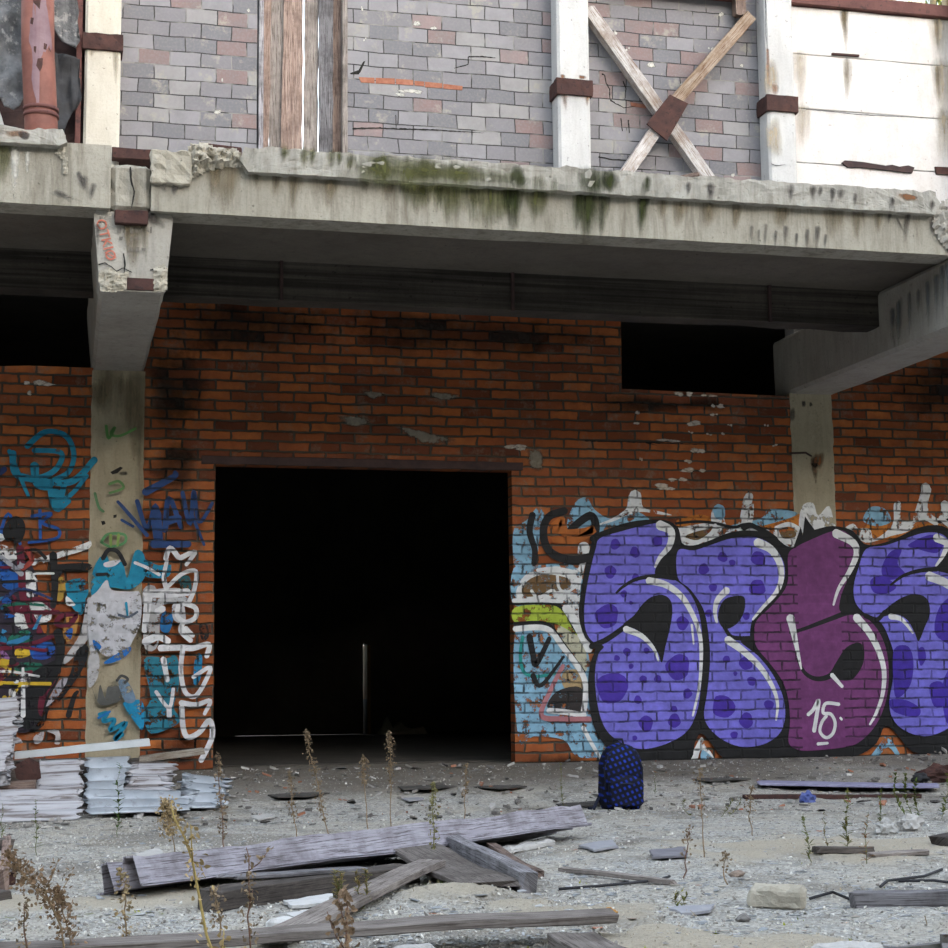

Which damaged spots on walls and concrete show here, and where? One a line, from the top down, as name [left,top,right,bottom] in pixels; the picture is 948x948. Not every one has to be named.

spalling [149,142,243,188]
crack [128,167,136,208]
damp [402,167,546,221]
damp [574,170,616,231]
damp [639,177,650,226]
damp [706,184,714,219]
damp [751,207,827,244]
damp [811,187,842,225]
damp [877,197,910,228]
spalling [932,199,948,249]
spalling [98,268,129,292]
spalling [153,264,168,292]